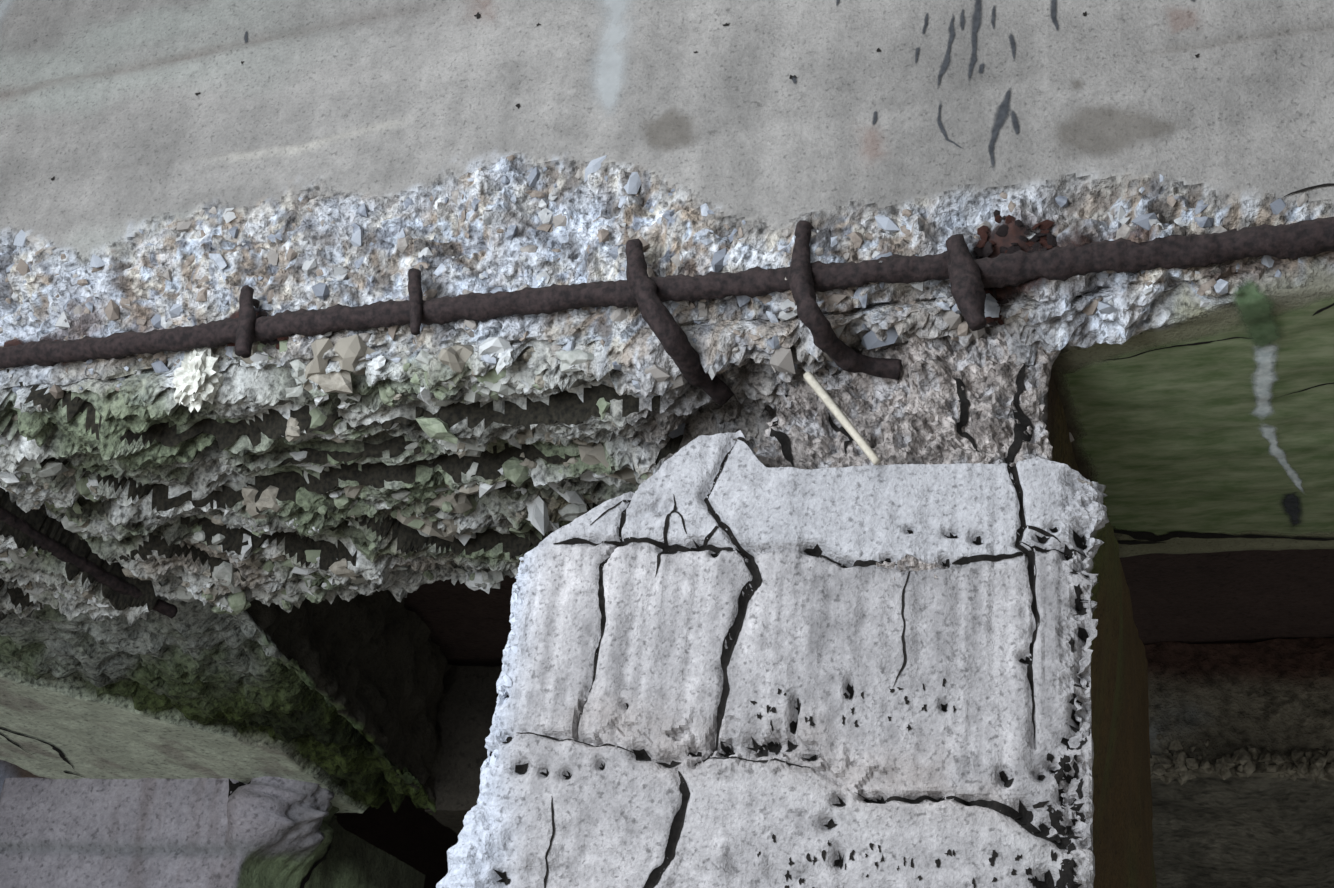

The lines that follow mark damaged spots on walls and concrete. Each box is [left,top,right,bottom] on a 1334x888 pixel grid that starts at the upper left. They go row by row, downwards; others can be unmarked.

damp [598,0,625,107]
corrosion [4,336,63,347]
corrosion [227,298,267,319]
spalling [0,153,1334,347]
corrosion [984,277,1047,327]
corrosion [973,210,1087,258]
crack [829,414,853,457]
crack [0,369,811,888]
spalling [0,251,1334,888]
crack [815,553,910,688]
crack [952,364,1086,749]
crack [854,792,1067,849]